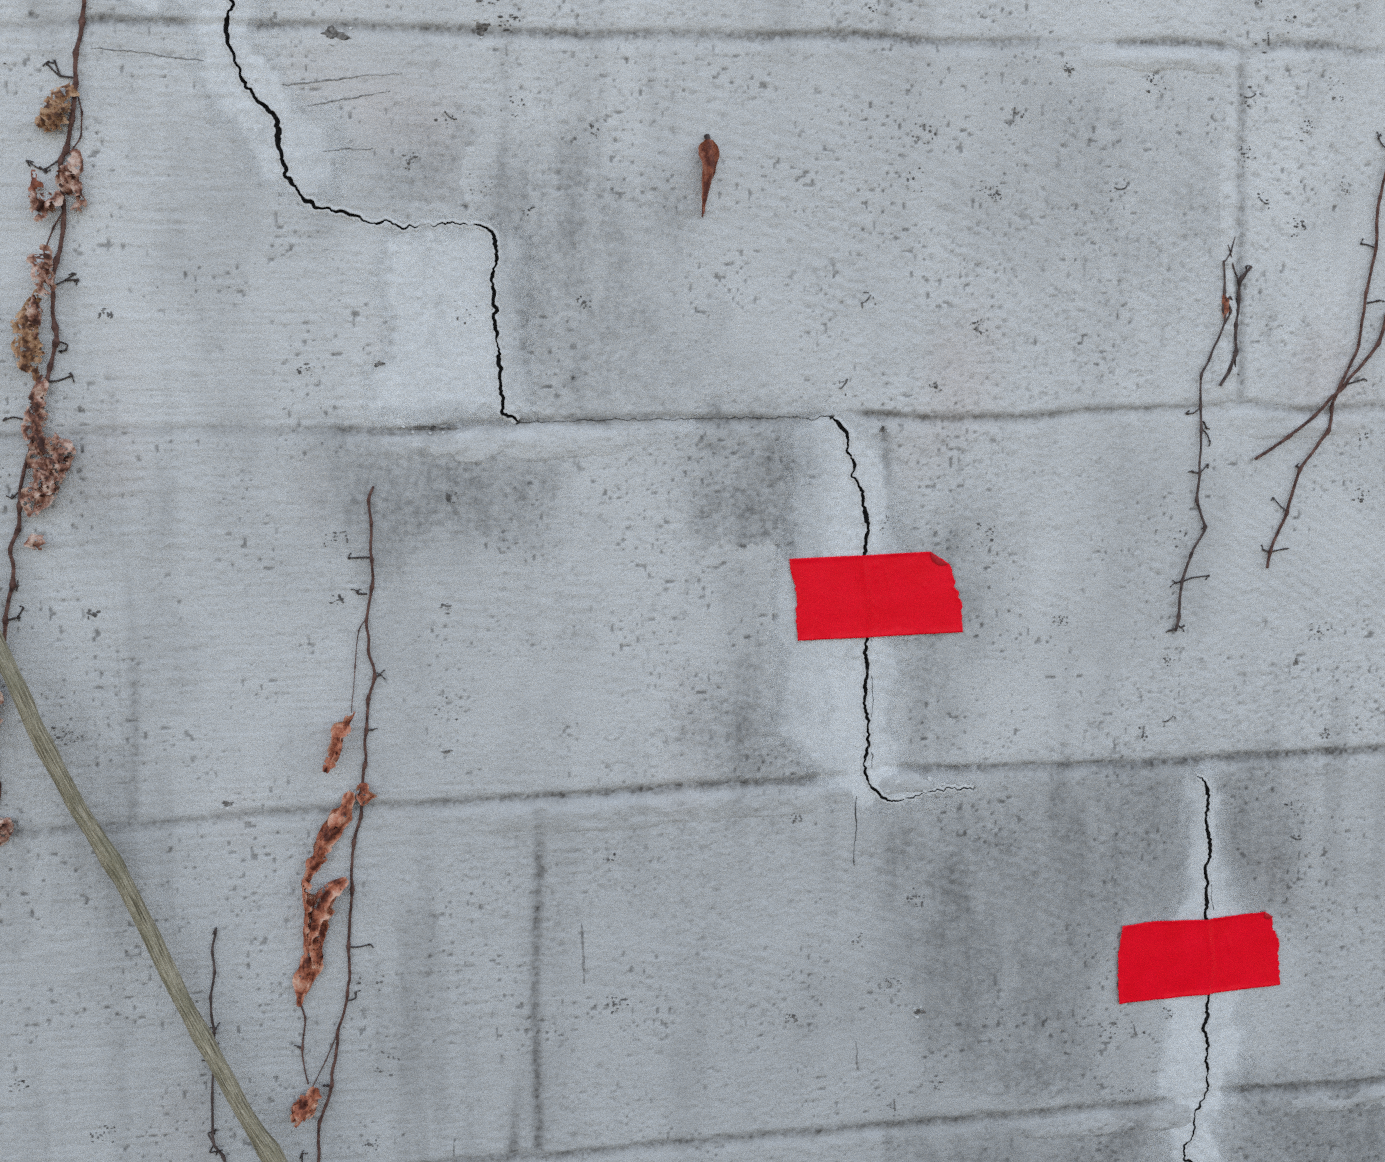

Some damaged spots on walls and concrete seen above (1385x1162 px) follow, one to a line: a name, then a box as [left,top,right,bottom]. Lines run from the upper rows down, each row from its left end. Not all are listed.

crack [220,0,873,555]
crack [853,637,974,866]
crack [1195,773,1215,920]
crack [1180,994,1212,1162]